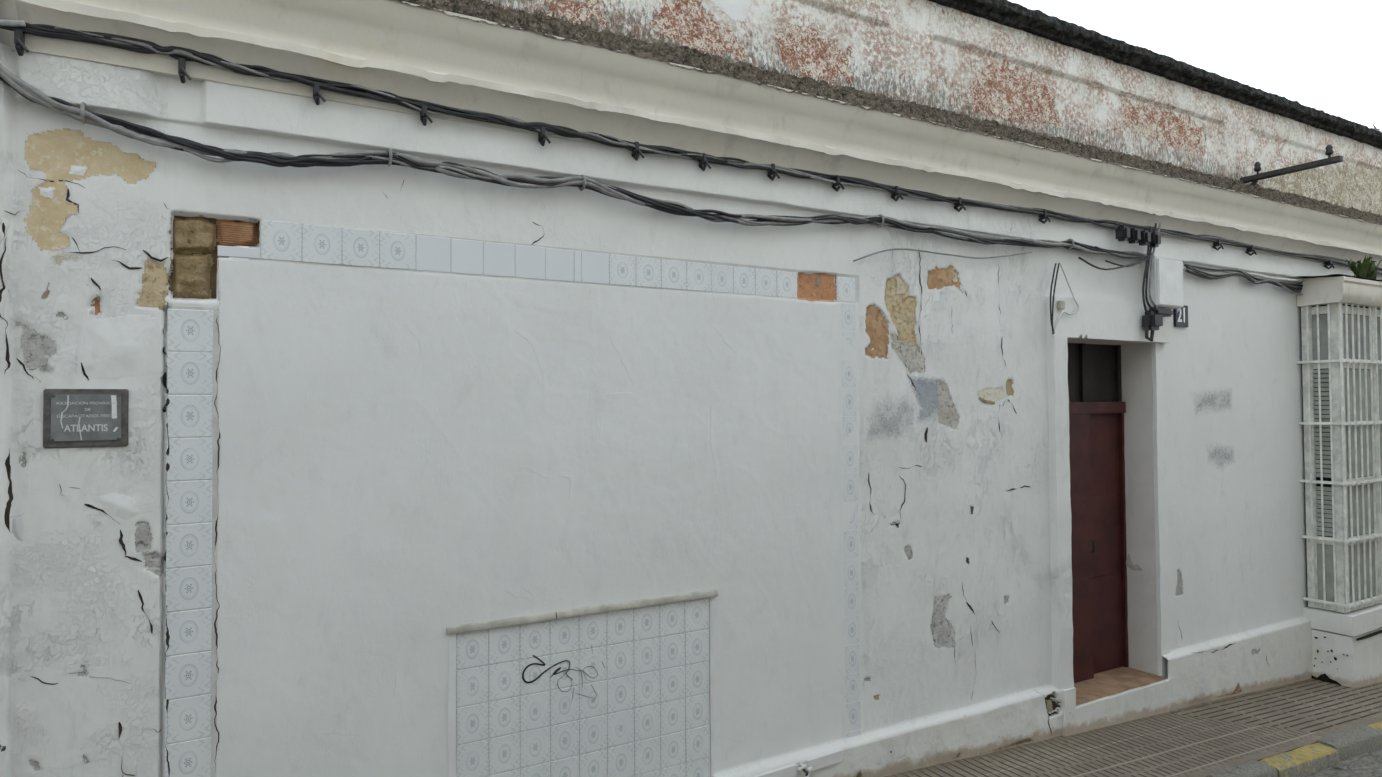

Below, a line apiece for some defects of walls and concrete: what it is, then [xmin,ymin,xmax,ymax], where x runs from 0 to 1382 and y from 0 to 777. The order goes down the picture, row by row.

crack [0,211,43,382]
flaking render [24,128,156,262]
crack [18,170,169,297]
peeling [137,215,260,310]
spalling [865,266,963,429]
flaking render [978,379,1014,404]
crack [4,448,22,533]
spalling [135,521,168,577]
spalling [930,594,955,648]